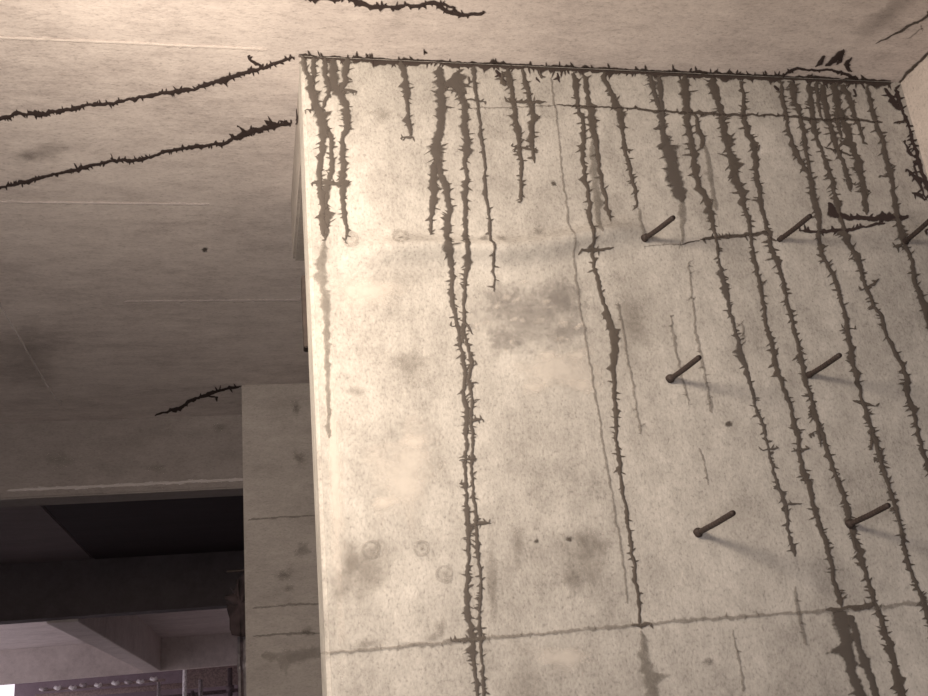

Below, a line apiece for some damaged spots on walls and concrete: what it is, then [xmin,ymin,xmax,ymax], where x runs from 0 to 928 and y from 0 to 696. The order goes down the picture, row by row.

crack [305,0,485,19]
crack [876,11,928,44]
crack [0,49,928,124]
crack [0,109,298,190]
crack [799,202,928,236]
crack [682,231,777,245]
crack [155,384,242,416]